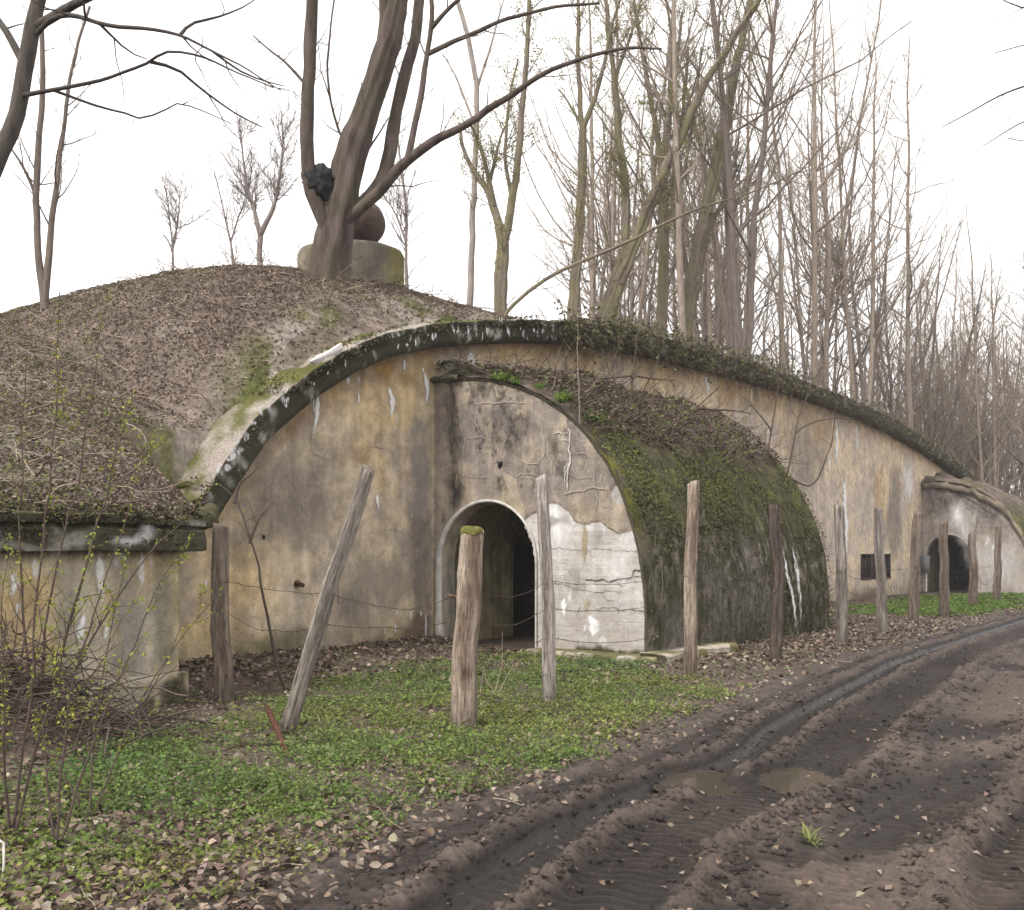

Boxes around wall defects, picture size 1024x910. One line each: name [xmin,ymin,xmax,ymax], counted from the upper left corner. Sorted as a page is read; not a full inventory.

leakage [449,383,460,510]
crack [461,400,615,513]
spalling [611,486,623,505]
spalling [525,504,645,653]
leakage [783,551,802,618]